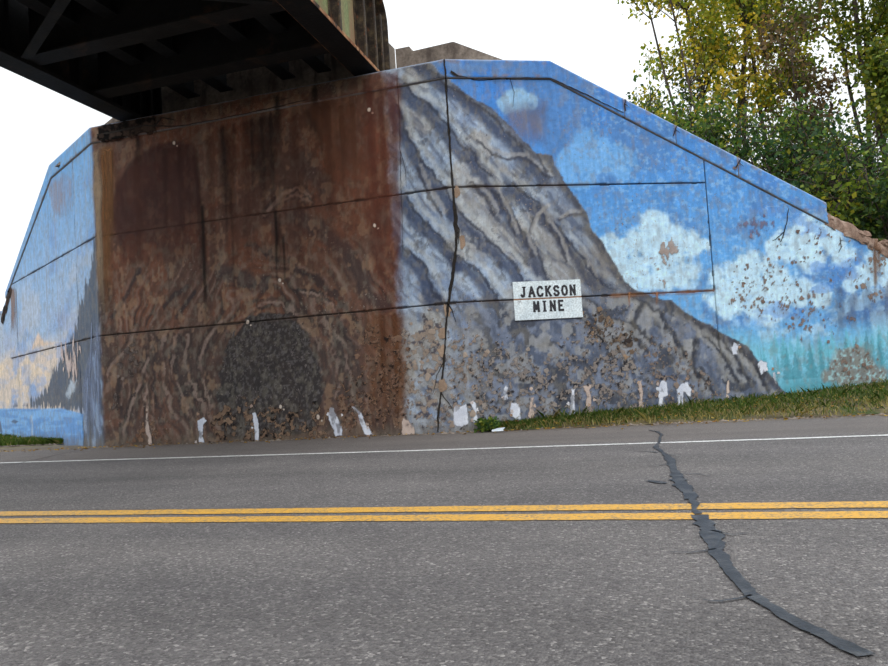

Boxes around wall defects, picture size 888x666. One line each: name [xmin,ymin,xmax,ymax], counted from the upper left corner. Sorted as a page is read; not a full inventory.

corrosion [101,148,113,272]
crack [433,59,630,432]
spalling [729,213,888,343]
peeling [195,304,730,443]